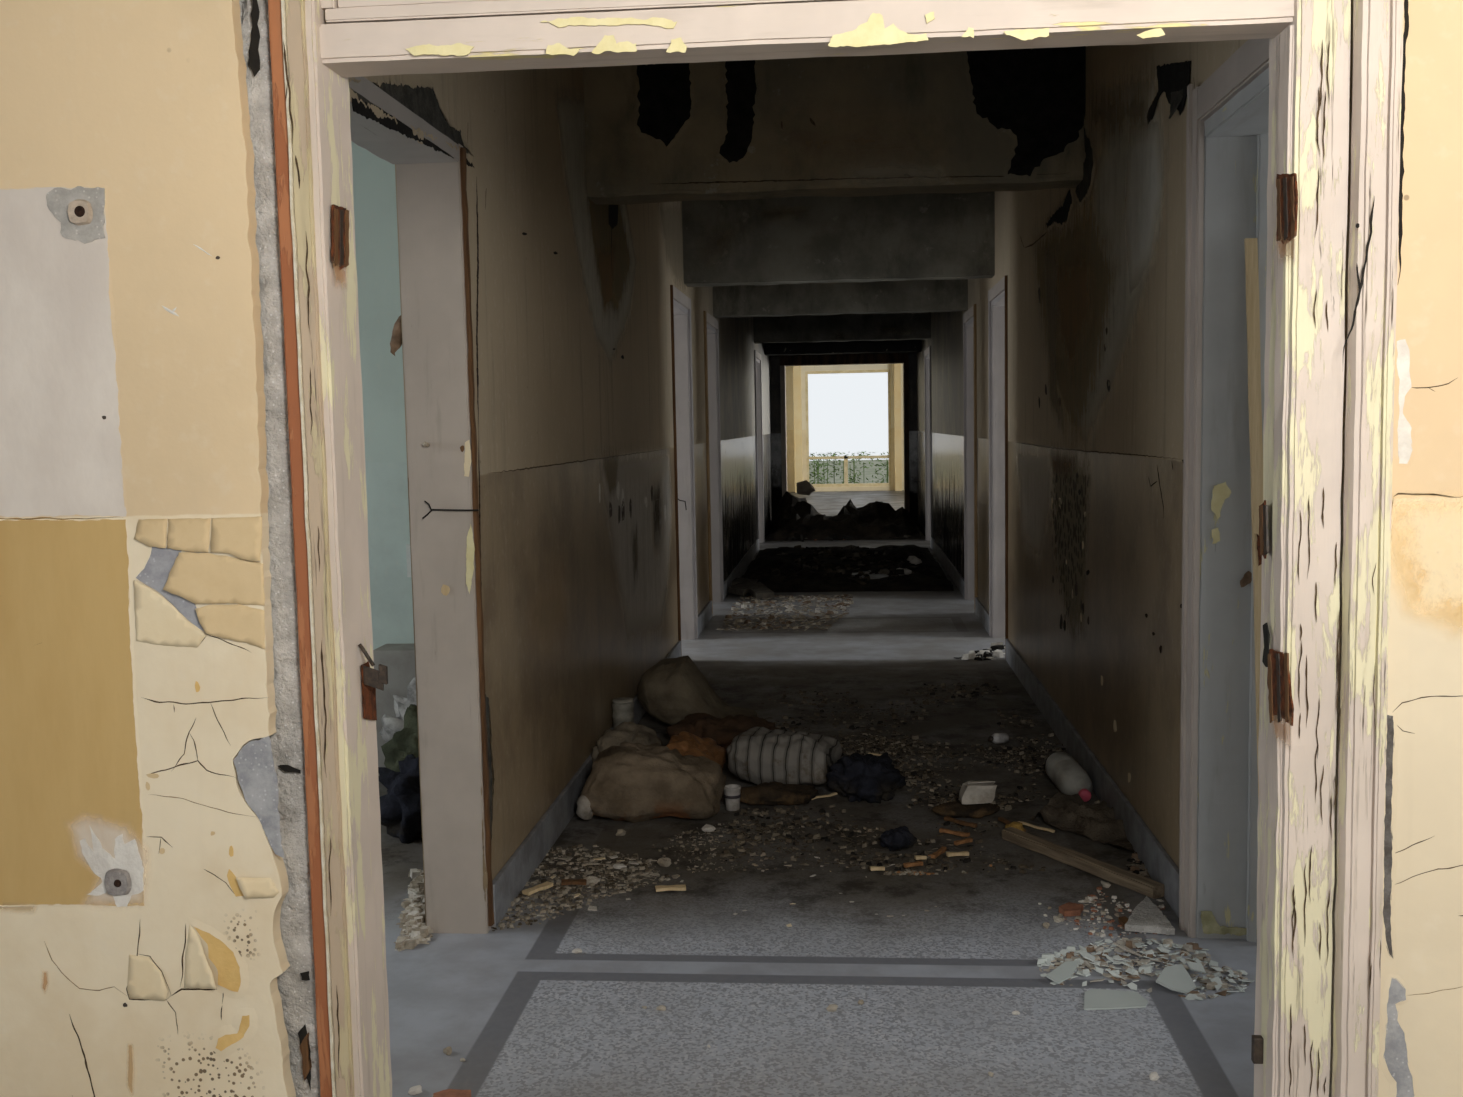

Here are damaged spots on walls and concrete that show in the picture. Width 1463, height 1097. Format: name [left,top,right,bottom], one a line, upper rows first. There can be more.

spalling [541,17,696,151]
spalling [714,60,762,166]
peeling [828,12,935,47]
spalling [962,27,1096,231]
peeling [0,0,321,1097]
water stain [1019,453,1088,625]
water stain [1397,509,1463,620]
crack [141,697,268,817]
flaking render [1379,710,1420,1097]
crack [44,924,224,1097]